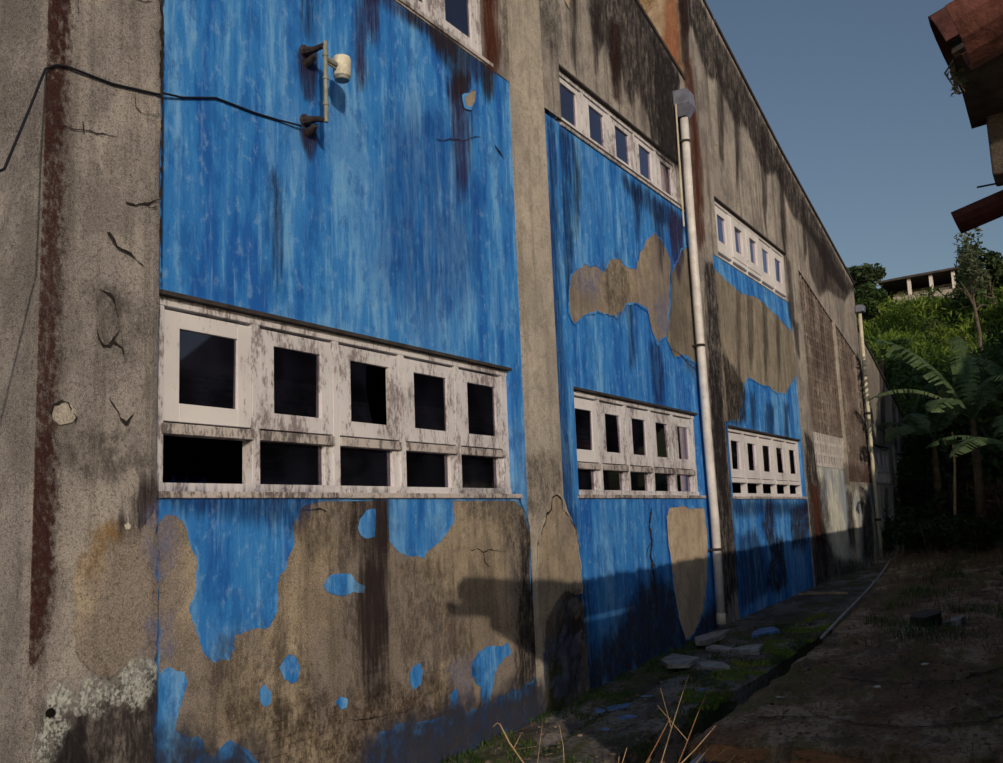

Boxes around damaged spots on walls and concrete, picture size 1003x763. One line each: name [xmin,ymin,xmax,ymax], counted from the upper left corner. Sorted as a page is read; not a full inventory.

corrosion [28,0,73,669]
crack [97,289,124,354]
crack [109,398,134,425]
crack [107,0,164,288]
water stain [256,119,582,763]
corrosion [483,0,501,70]
peeling [568,231,698,368]
corrosion [665,0,705,249]
water stain [588,0,853,358]
water stain [31,659,245,763]
peeling [73,493,583,763]
peeling [666,504,708,640]